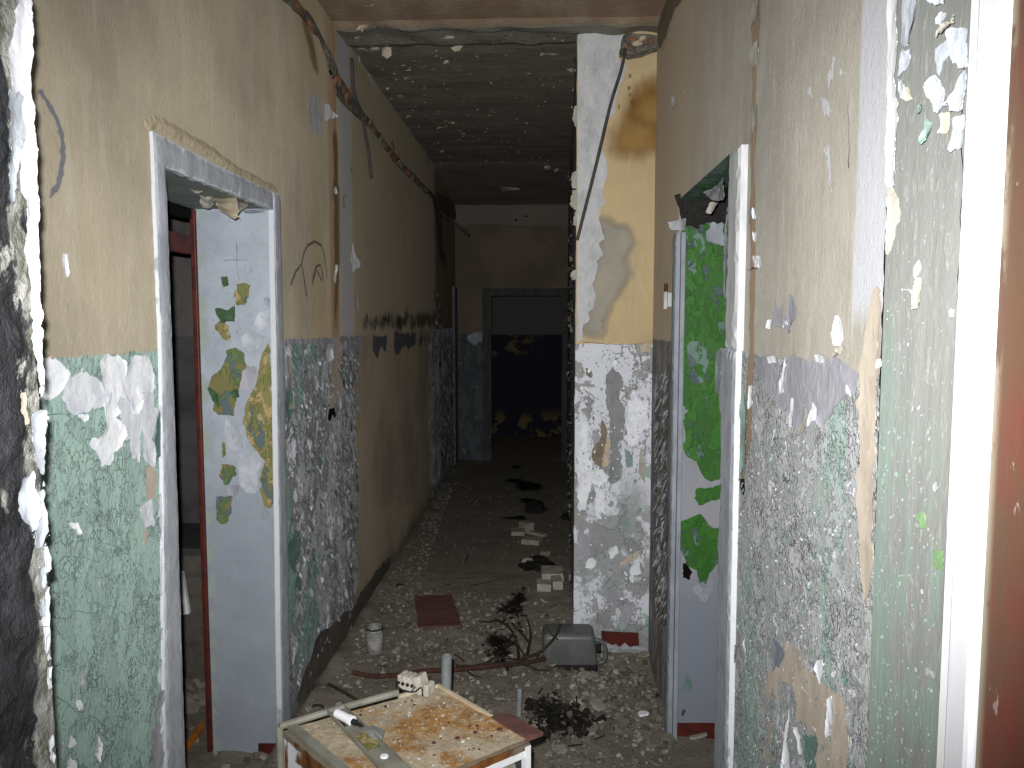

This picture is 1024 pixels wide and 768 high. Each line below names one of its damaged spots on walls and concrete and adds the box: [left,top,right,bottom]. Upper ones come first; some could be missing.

peeling [8,0,167,768]
peeling [544,0,681,650]
damp [615,81,657,155]
spalling [734,0,968,768]